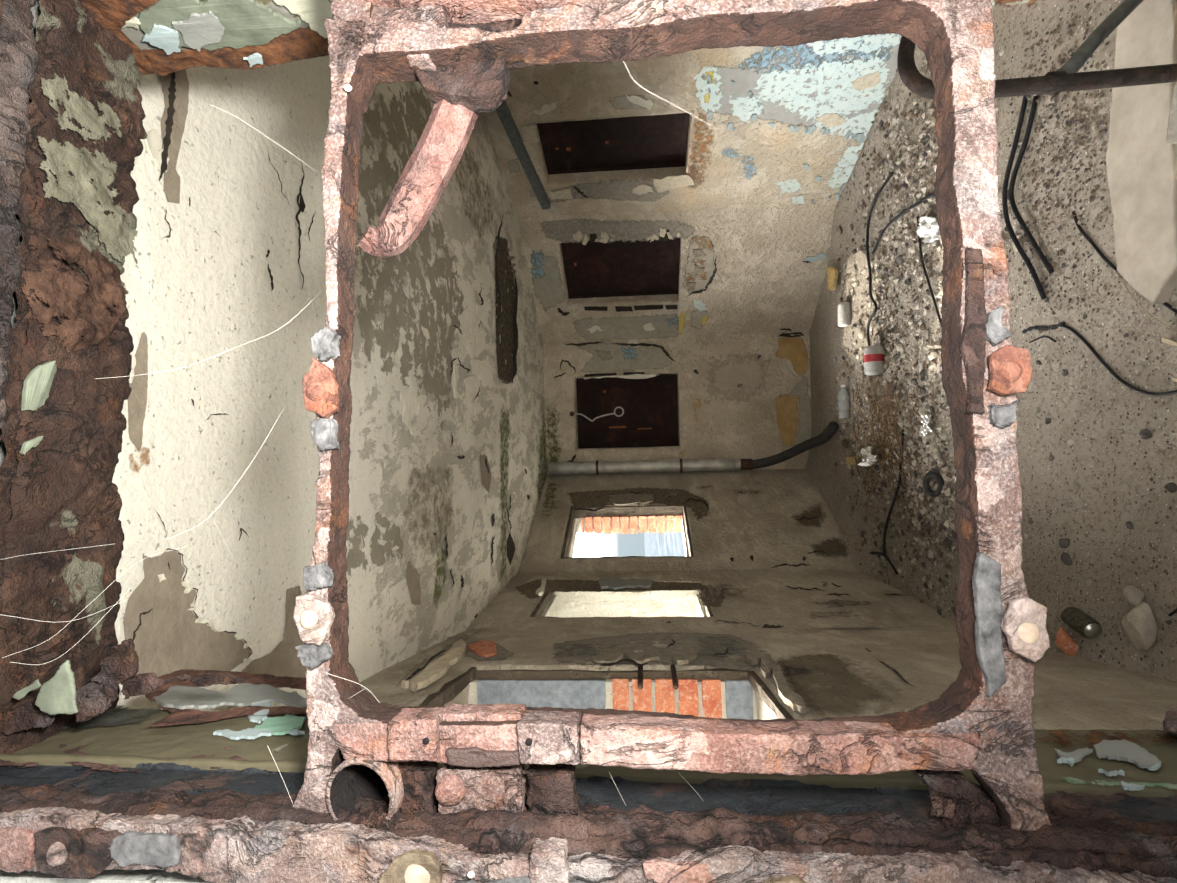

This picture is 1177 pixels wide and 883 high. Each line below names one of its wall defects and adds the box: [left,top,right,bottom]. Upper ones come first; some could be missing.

peeling [122,0,332,67]
spalling [144,69,189,203]
corrosion [688,114,715,188]
peeling [694,33,902,205]
crack [162,198,191,239]
crack [266,149,315,291]
corrosion [683,237,717,296]
peeling [123,548,307,740]
peeling [12,660,79,715]